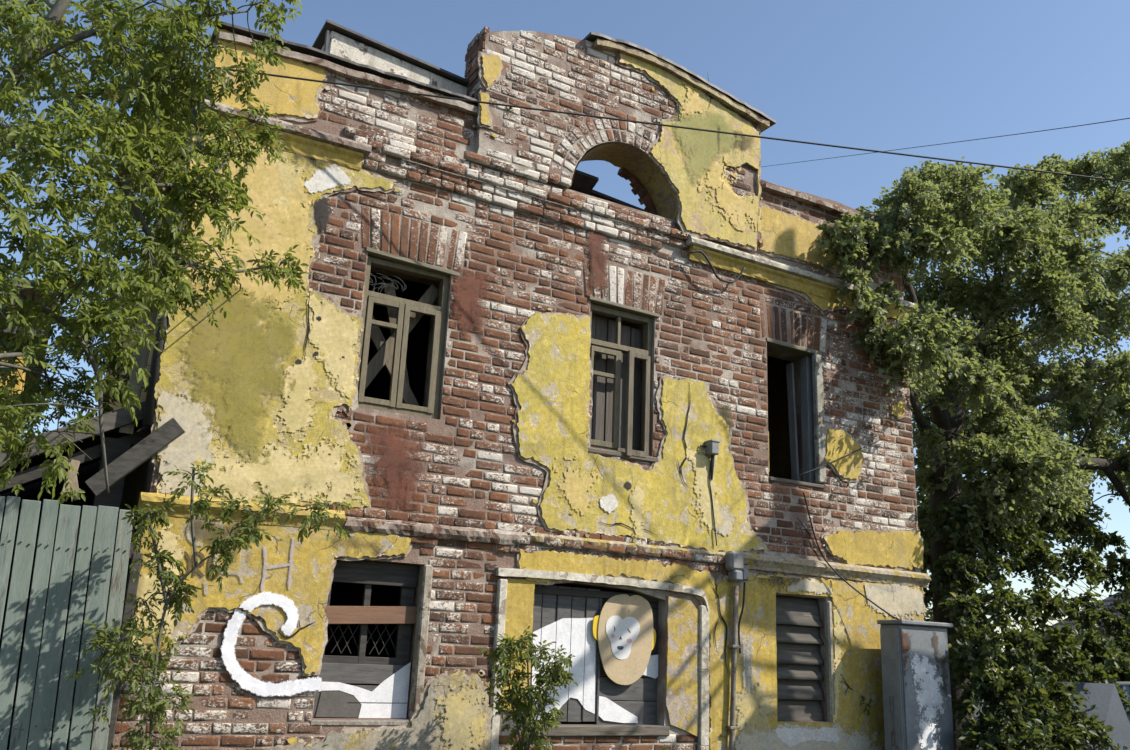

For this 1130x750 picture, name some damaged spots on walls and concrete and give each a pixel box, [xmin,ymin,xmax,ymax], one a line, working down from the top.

damp [178,279,299,465]
flaking render [152,26,918,750]
crack [677,384,690,487]
flaking render [114,523,325,750]
peeling [865,584,928,620]
peeling [932,631,948,697]